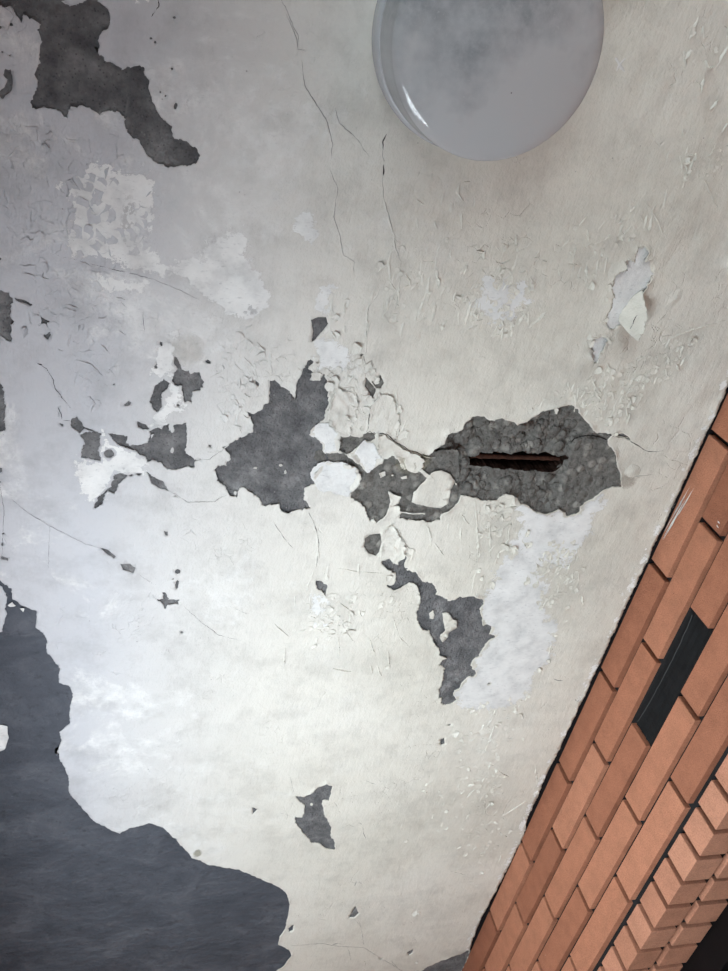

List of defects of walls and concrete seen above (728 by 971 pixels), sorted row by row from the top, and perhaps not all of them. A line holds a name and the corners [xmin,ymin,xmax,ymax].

peeling [0,0,275,321]
crack [280,0,401,376]
peeling [0,290,51,341]
peeling [469,271,536,327]
peeling [592,248,653,363]
peeling [60,330,211,508]
spalling [209,284,629,711]
peeling [101,548,135,573]
peeling [157,569,180,608]
peeling [0,581,293,971]
peeling [295,784,335,849]
peeling [407,950,470,971]